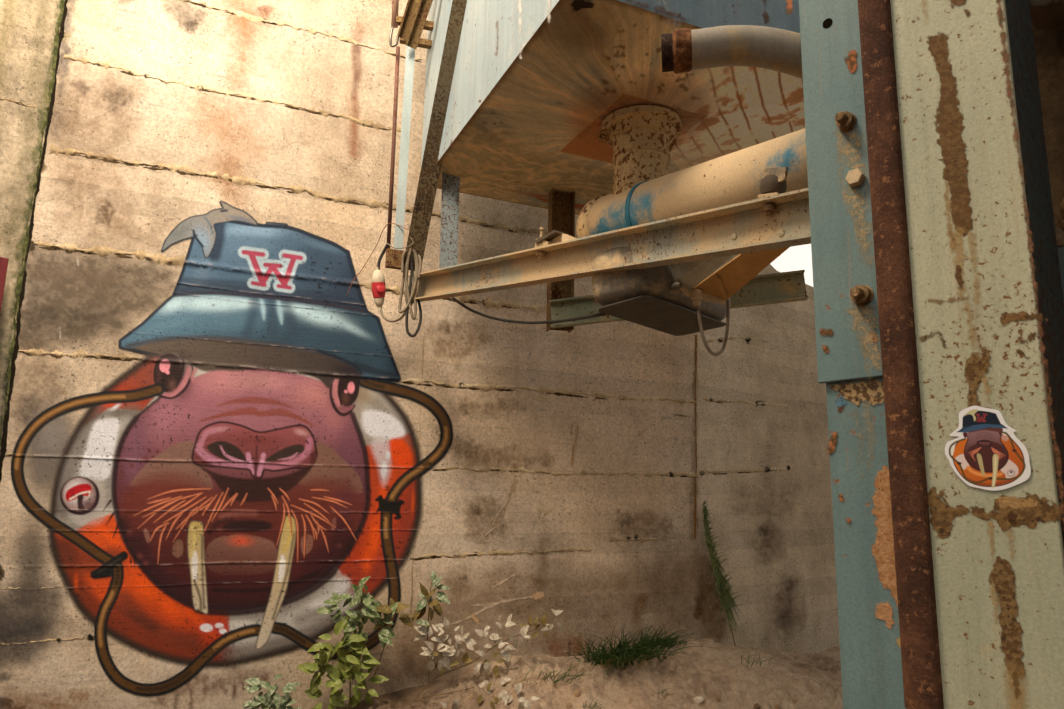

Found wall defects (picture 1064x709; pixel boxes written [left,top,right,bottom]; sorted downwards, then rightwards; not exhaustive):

crack [0,0,68,482]
peeling [871,465,901,648]